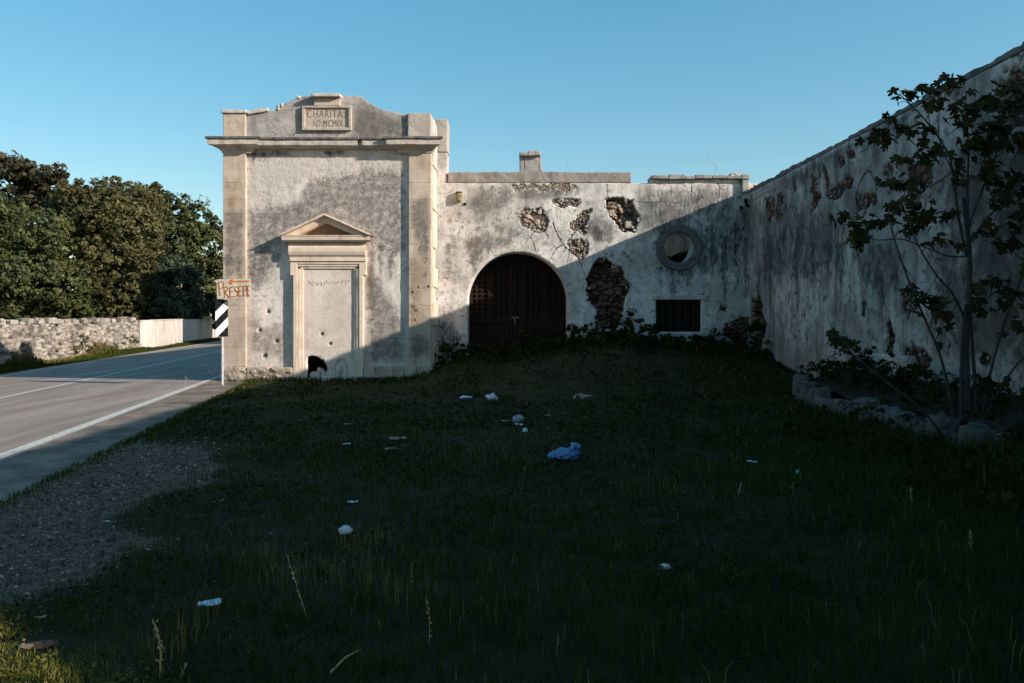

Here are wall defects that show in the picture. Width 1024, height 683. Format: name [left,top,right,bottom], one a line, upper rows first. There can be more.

water stain [225,171,429,364]
spalling [513,183,630,329]
spalling [605,188,730,232]
water stain [656,136,876,301]
water stain [926,116,1024,365]